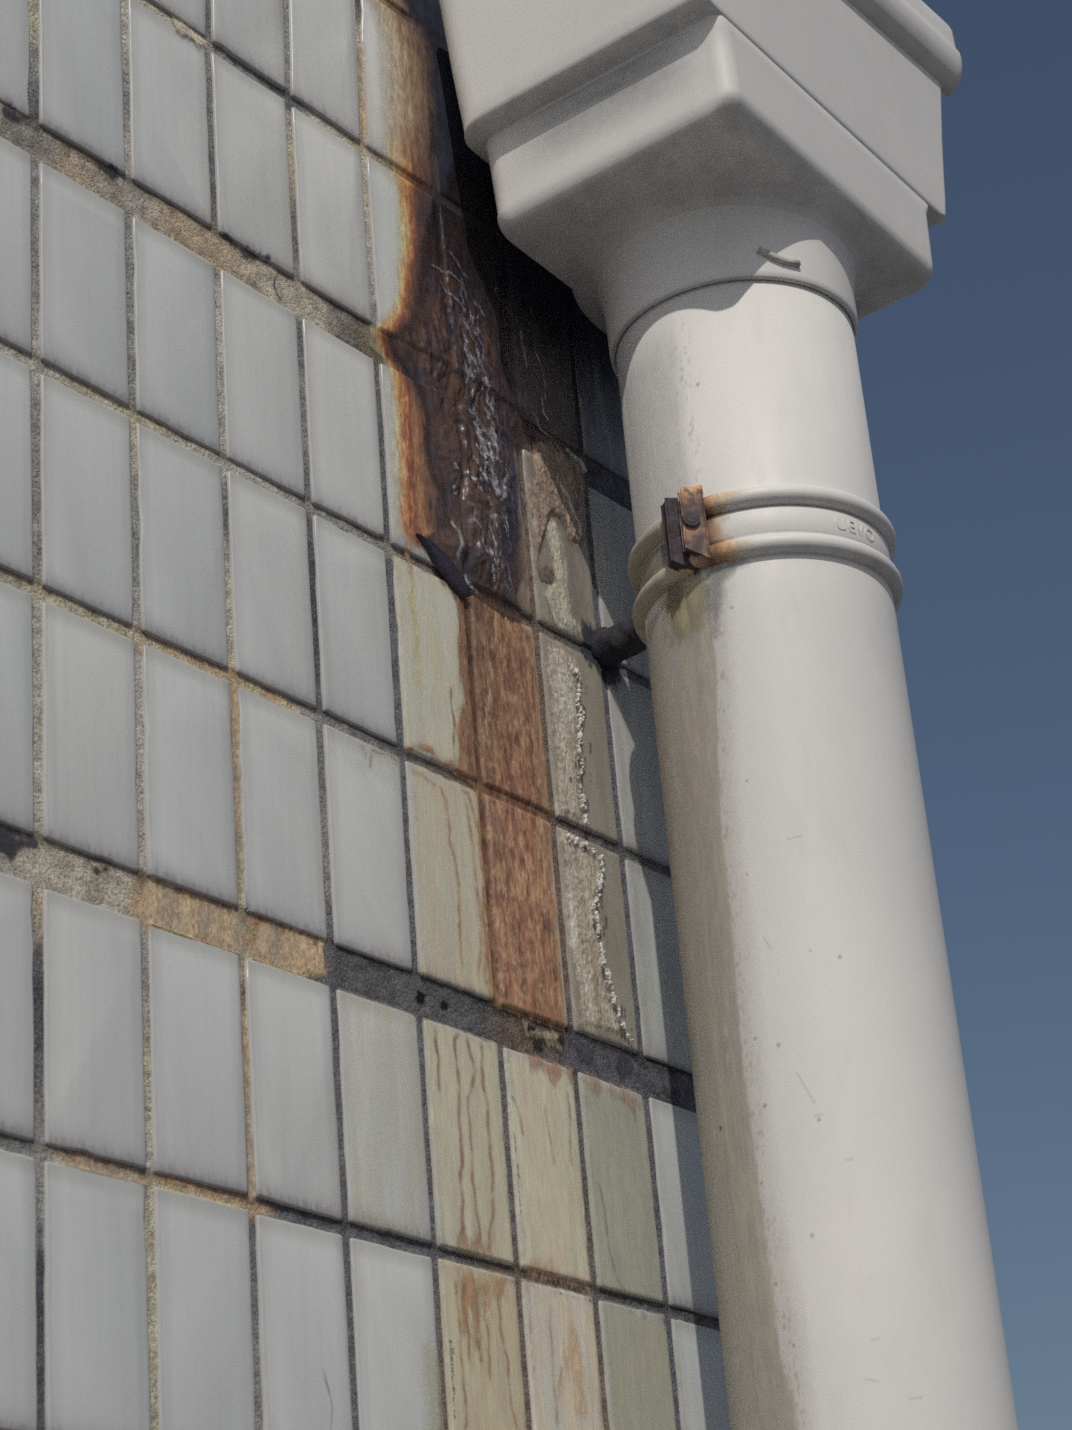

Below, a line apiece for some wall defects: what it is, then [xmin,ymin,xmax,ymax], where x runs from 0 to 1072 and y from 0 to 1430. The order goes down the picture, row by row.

rust [138,638,325,974]
rust [357,46,367,142]
rust [370,0,542,561]
rust [406,513,566,1030]
leakage [370,0,613,995]
rust [692,494,735,571]